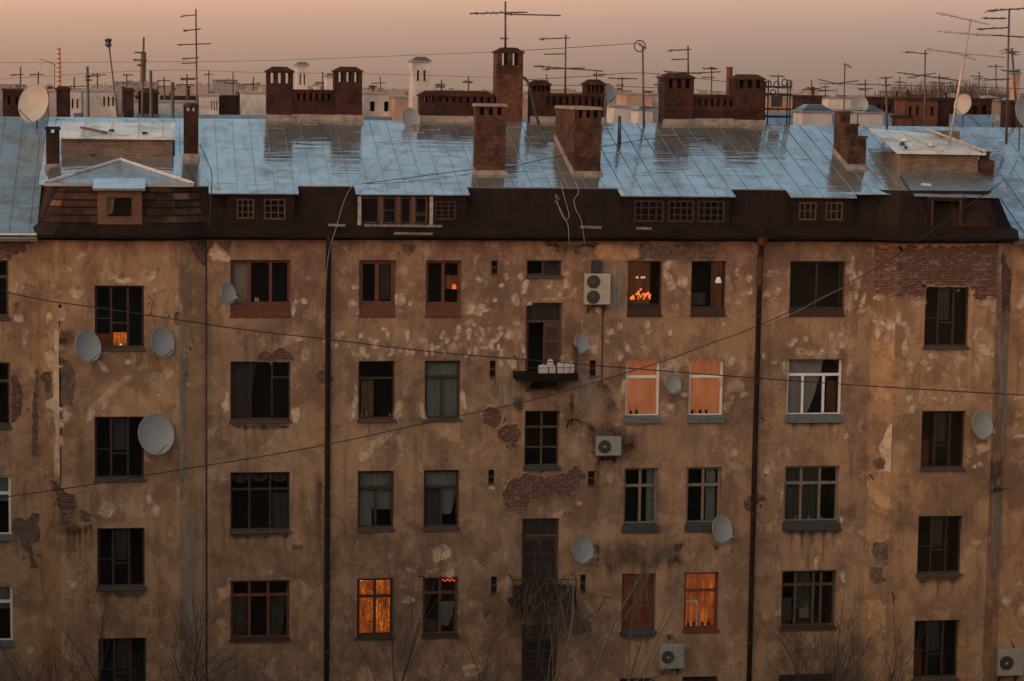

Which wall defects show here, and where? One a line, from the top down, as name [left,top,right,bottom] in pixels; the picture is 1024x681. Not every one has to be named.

flaking render [845,242,1024,413]
flaking render [256,337,309,372]
flaking render [9,357,115,530]
peeling [394,399,403,420]
flaking render [460,388,522,450]
peeling [967,436,991,469]
flaking render [488,463,587,513]
flaking render [11,510,41,571]
peeling [406,544,462,577]
flaking render [868,540,888,587]